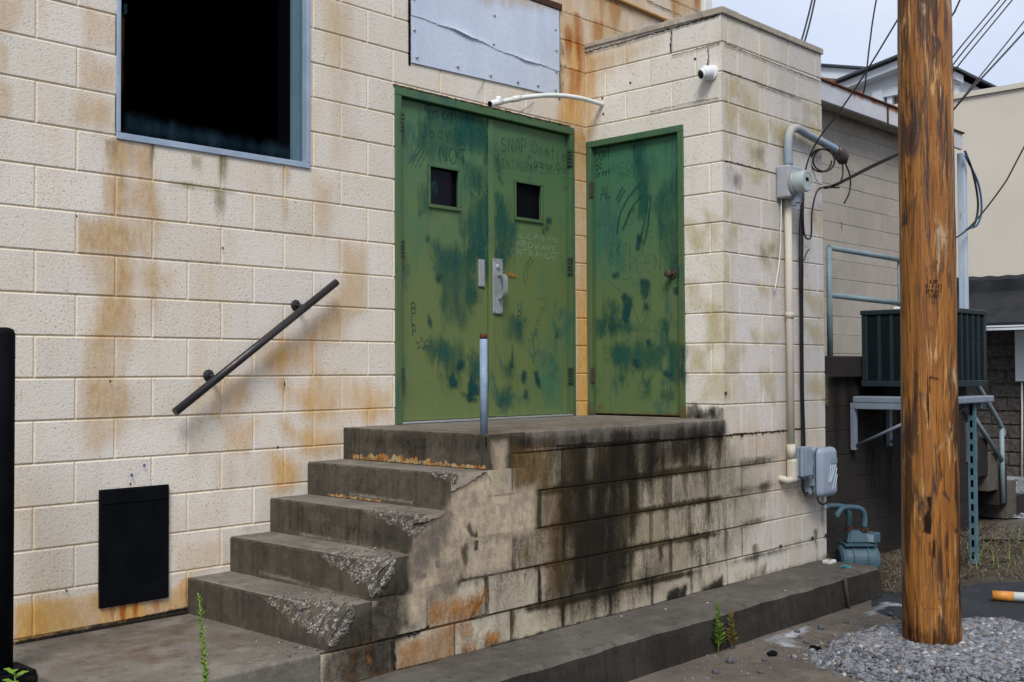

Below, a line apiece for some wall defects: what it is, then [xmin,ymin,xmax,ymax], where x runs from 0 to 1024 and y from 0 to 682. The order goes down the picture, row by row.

corrosion [566,12,580,55]
spalling [328,493,428,537]
water stain [409,405,727,647]
spalling [321,551,396,597]
spalling [265,593,355,647]